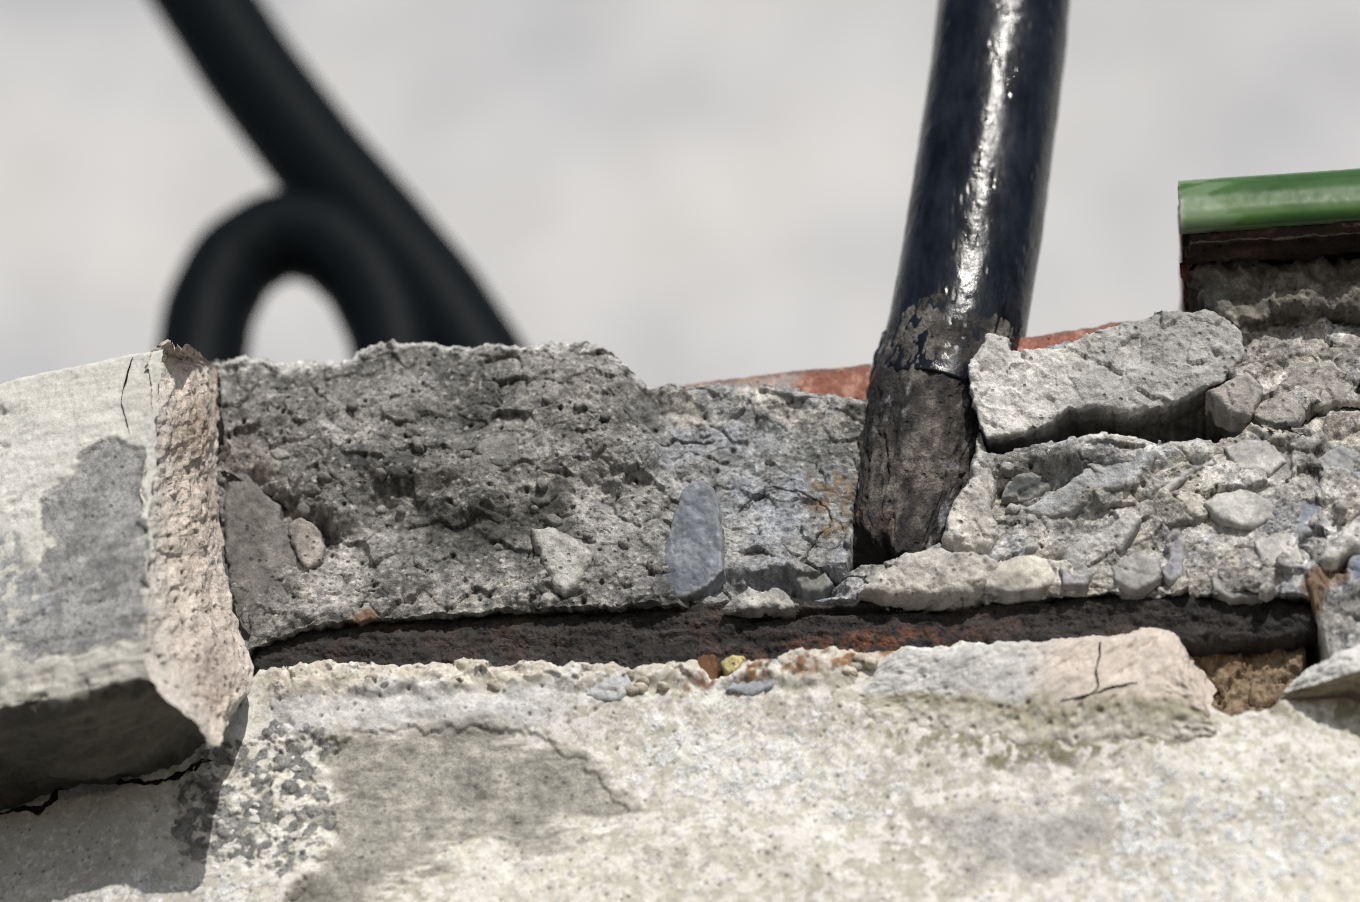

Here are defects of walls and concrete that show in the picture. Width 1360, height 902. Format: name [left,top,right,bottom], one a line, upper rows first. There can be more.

crack [1247,385,1360,436]
spalling [210,309,1360,668]
rust [251,566,1349,694]
crack [116,759,213,785]
crack [0,788,64,815]